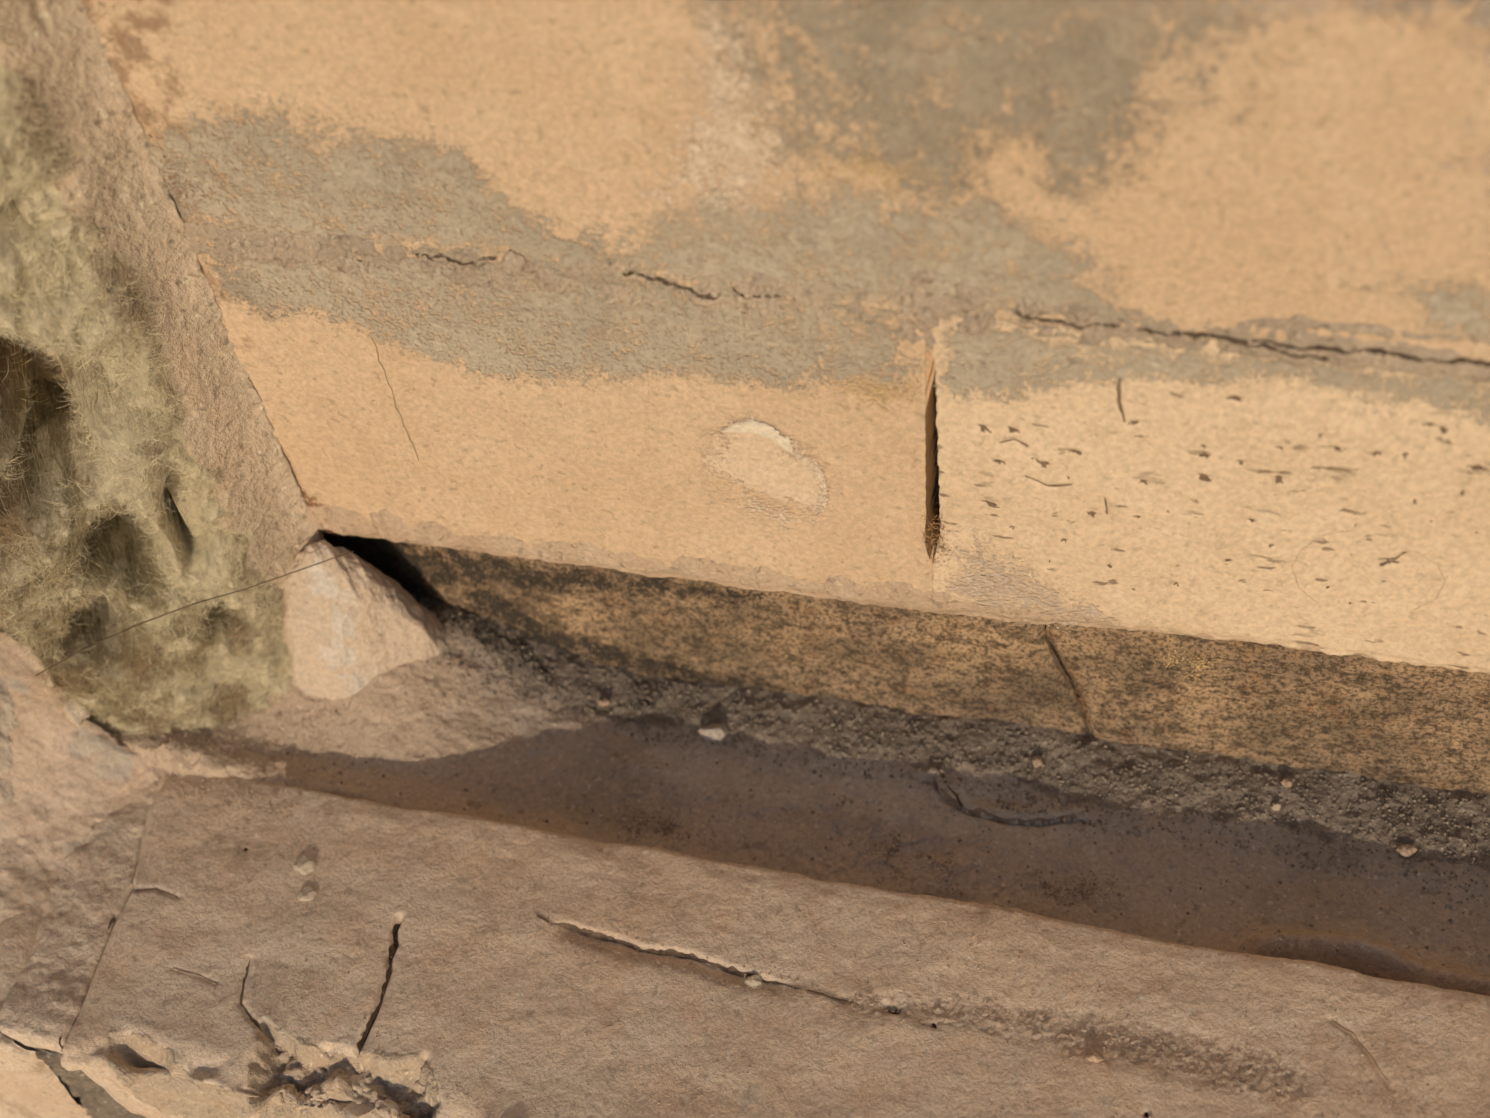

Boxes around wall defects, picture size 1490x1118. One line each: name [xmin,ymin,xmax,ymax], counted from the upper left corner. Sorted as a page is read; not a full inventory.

damp [143,0,1490,433]
crack [1010,309,1490,368]
flaking render [693,410,841,538]
crack [932,375,940,508]
spalling [105,960,439,1118]
crack [357,923,401,1054]
crack [536,914,863,1008]